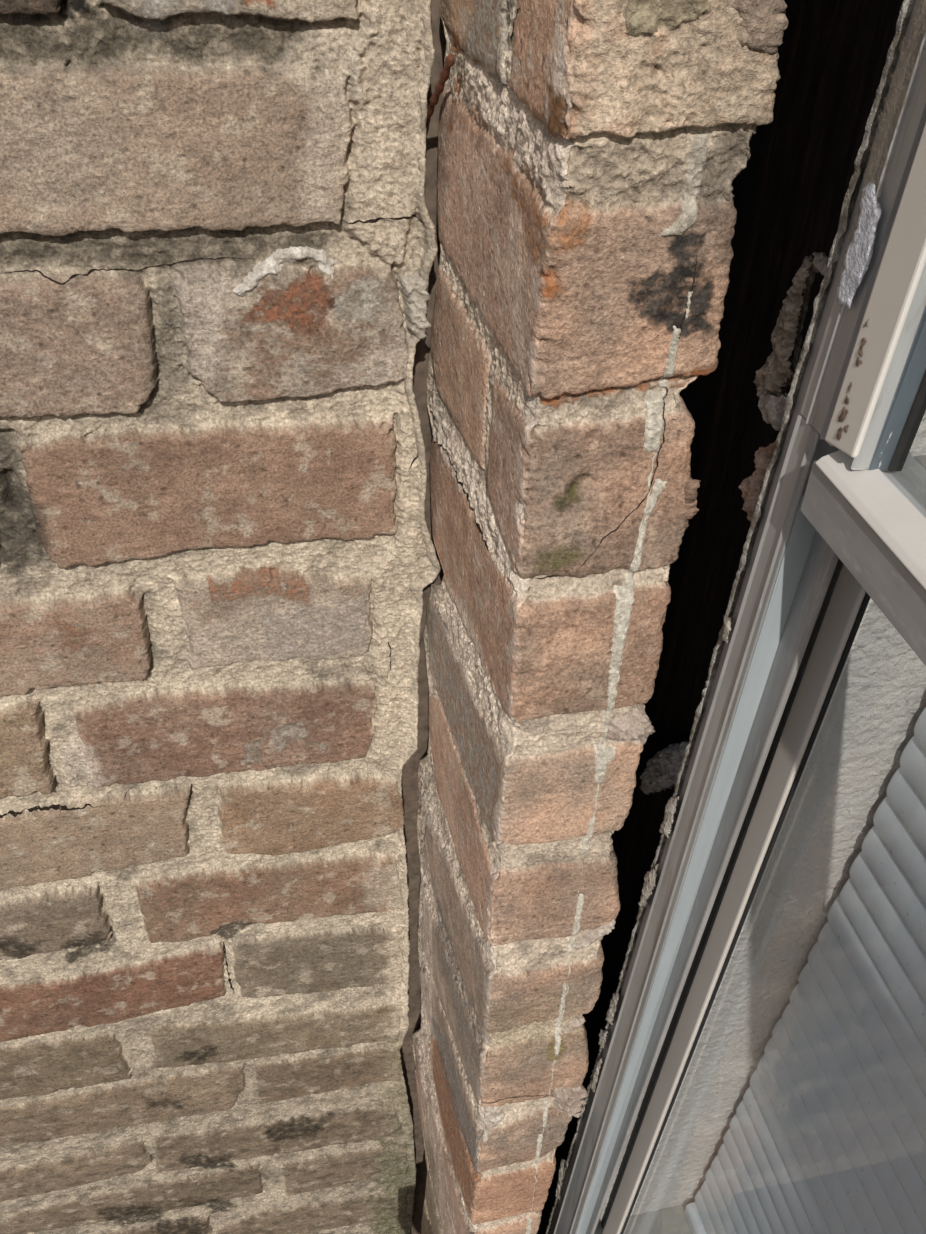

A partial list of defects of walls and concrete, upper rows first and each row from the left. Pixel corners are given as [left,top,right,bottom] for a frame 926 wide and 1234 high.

water stain [630,233,713,337]
spalling [738,441,775,522]
crack [342,0,497,1234]
crack [0,804,107,818]